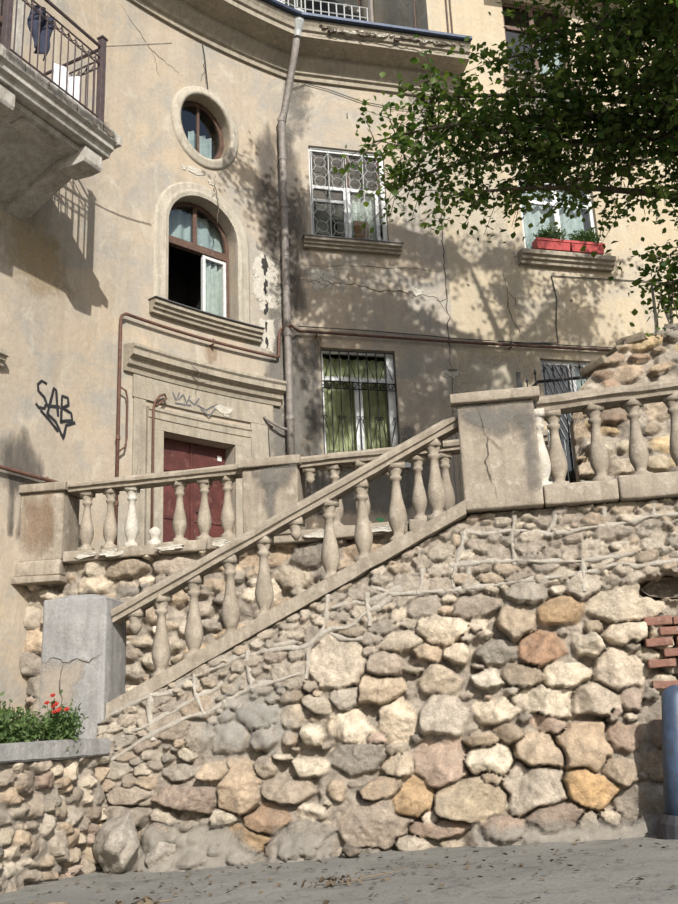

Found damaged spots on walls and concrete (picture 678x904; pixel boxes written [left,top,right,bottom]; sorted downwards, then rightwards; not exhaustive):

spalling [250,251,283,353]
leakage [252,84,322,518]
crack [292,155,453,394]
crack [503,275,523,338]
leakage [399,427,414,442]
leakage [3,437,41,535]
leakage [305,469,356,498]
leakage [342,491,356,513]
leakage [367,459,430,513]
crack [43,655,99,705]